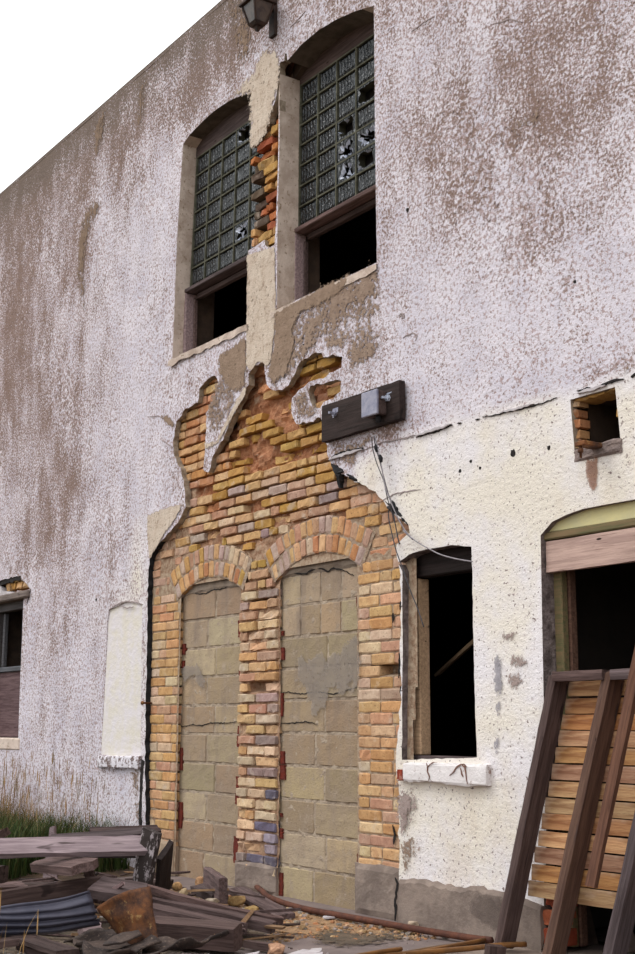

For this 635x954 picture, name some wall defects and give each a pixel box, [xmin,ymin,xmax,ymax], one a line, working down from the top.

flaking render [285,62,294,78]
flaking render [251,112,279,247]
damp [76,201,101,314]
crack [328,373,635,460]
flaking render [0,580,30,595]
flaking render [131,271,449,954]